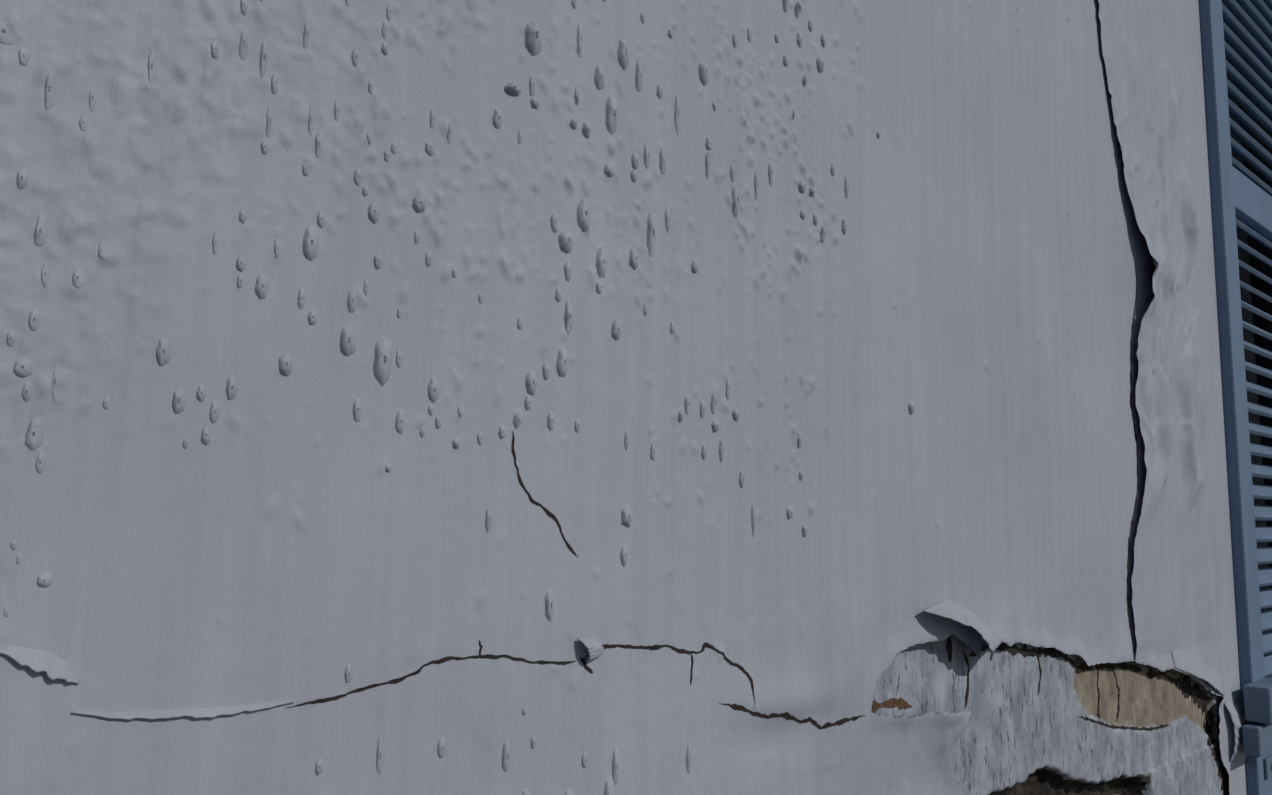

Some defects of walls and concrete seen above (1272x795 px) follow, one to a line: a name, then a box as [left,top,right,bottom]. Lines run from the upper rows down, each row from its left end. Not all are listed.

peeling [871,0,1247,795]
peeling [0,646,80,684]
peeling [71,700,294,720]
crack [286,639,866,729]